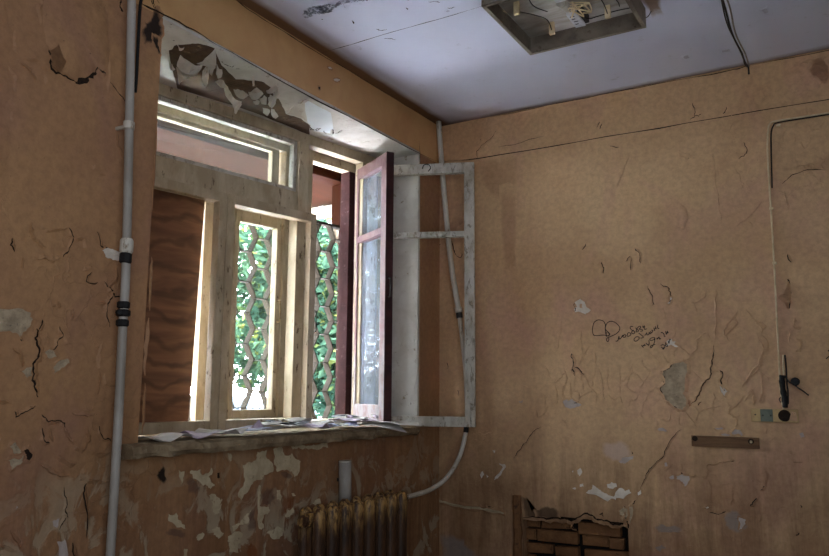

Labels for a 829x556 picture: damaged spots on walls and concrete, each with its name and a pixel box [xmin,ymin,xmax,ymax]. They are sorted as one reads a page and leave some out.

crack [48,47,125,101]
peeling [167,40,342,136]
crack [626,248,642,270]
crack [501,321,624,459]
spalling [657,358,691,412]
crack [628,284,770,534]
peeling [177,443,329,556]
spalling [523,466,642,531]